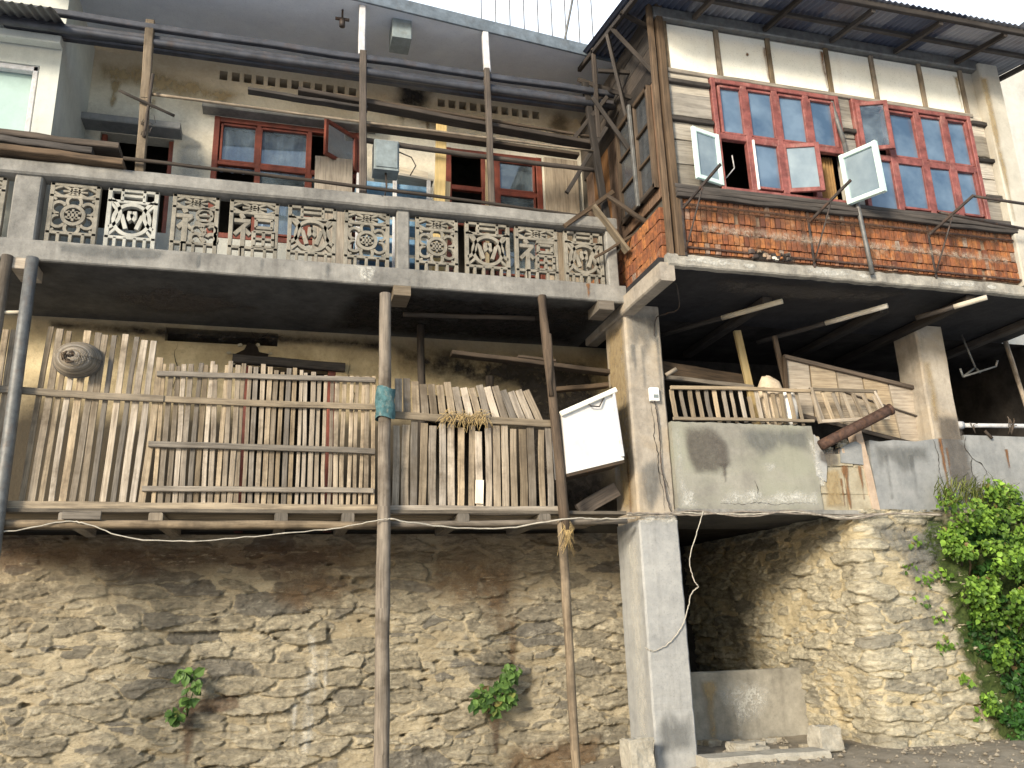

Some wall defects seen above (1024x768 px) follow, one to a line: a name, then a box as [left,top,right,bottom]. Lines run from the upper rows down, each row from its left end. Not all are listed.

damp [688,431,728,475]
spalling [810,435,864,485]
corrosion [840,466,865,507]